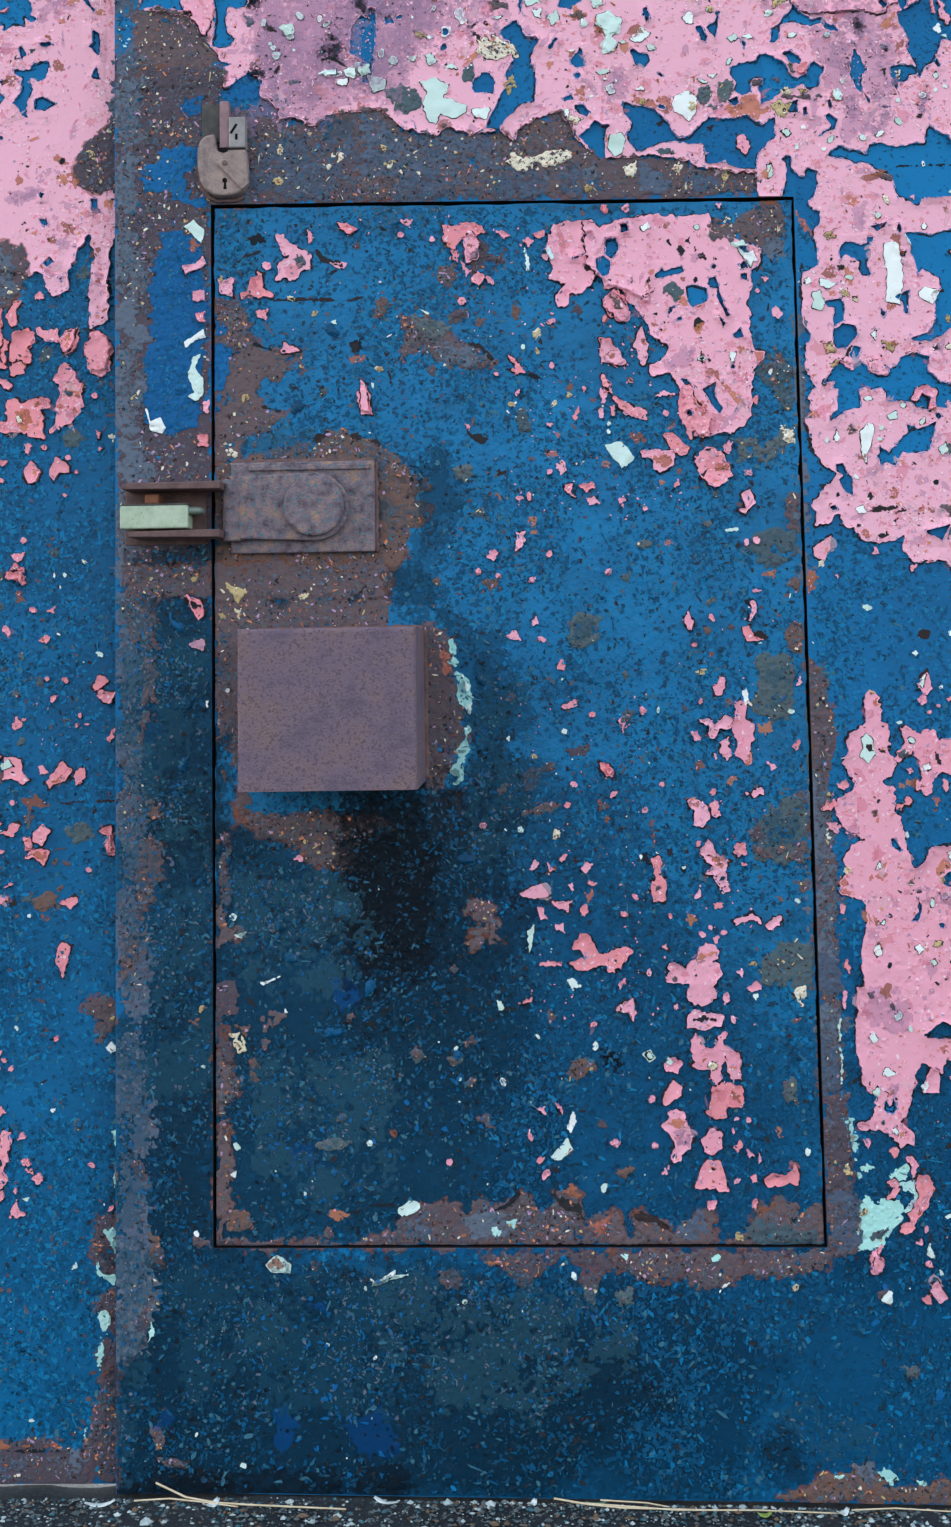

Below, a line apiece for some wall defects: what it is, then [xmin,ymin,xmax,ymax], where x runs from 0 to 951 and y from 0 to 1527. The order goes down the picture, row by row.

corrosion [47,0,848,952]
peeling [507,616,546,642]
peeling [0,822,51,866]
peeling [0,716,86,805]
peeling [55,942,71,978]
corrosion [73,789,166,1043]
corrosion [189,458,889,1302]
peeling [520,854,637,1022]
peeling [618,589,951,1305]
peeling [528,1103,585,1221]
corrosion [0,1087,165,1490]
corrosion [777,1463,951,1505]